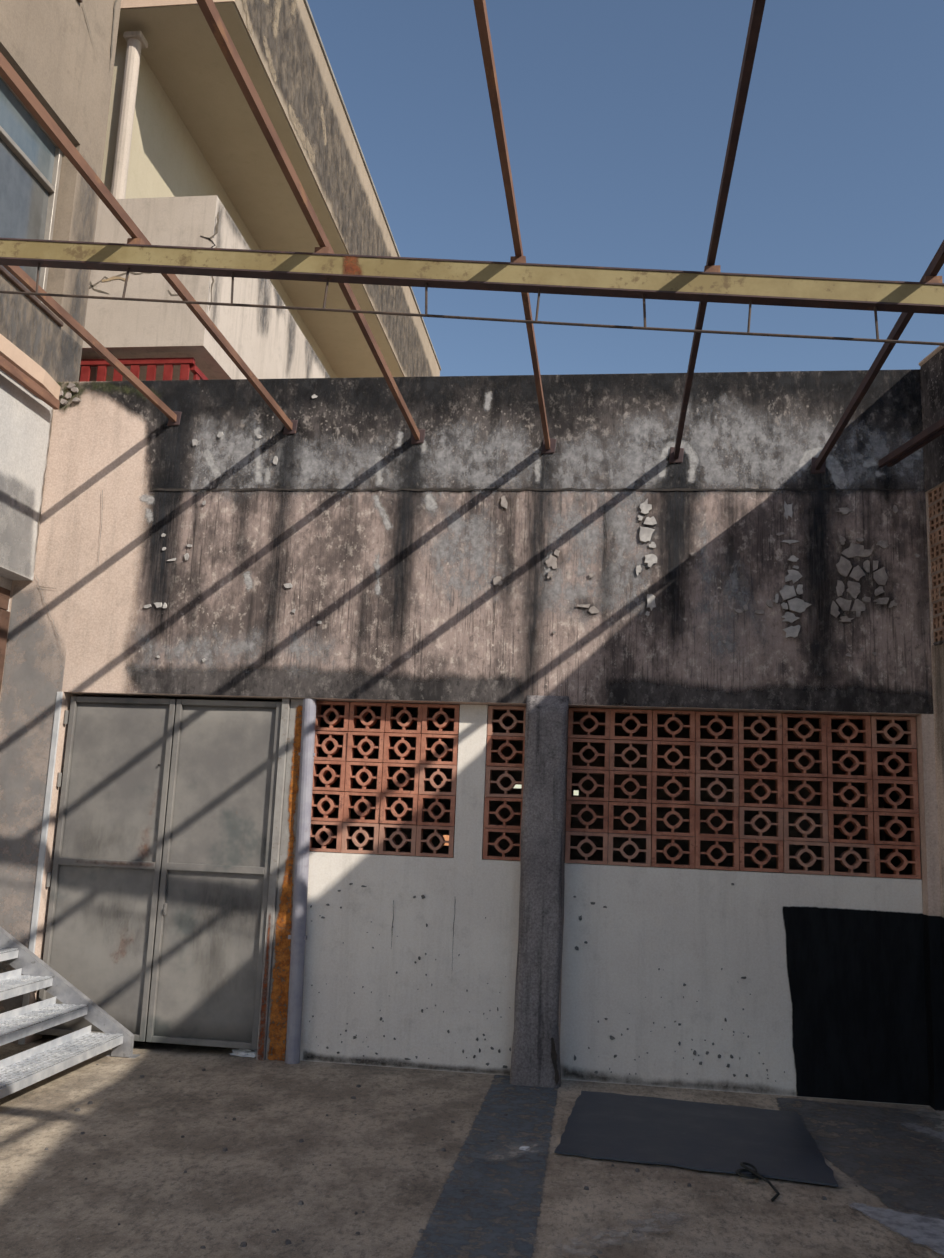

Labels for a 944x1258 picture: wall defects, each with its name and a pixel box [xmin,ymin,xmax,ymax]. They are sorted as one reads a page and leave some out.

crack [110,0,118,70]
damp [246,0,391,256]
damp [0,269,944,714]
flaking render [636,499,657,576]
flaking render [645,594,656,616]
flaking render [735,501,812,638]
flaking render [831,535,897,622]
corrosion [258,705,303,1061]